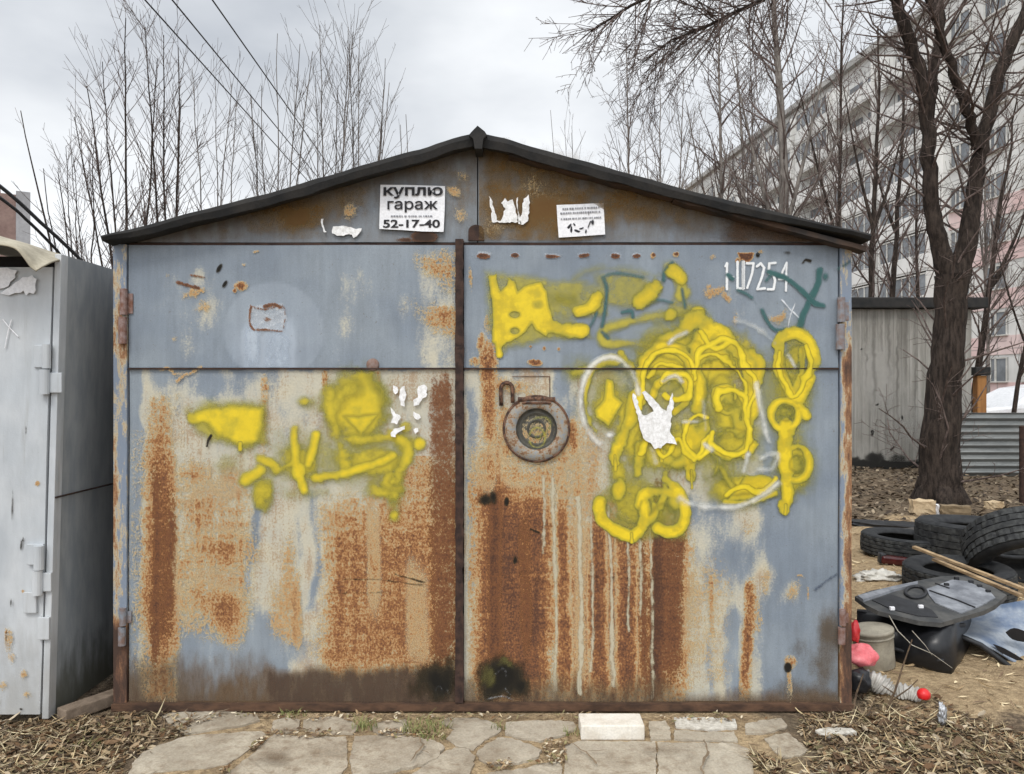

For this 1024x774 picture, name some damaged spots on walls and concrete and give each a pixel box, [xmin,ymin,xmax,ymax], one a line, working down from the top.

corrosion [396,231,456,339]
corrosion [130,366,261,702]
corrosion [260,374,269,455]
leakage [129,475,689,703]
corrosion [268,316,770,702]